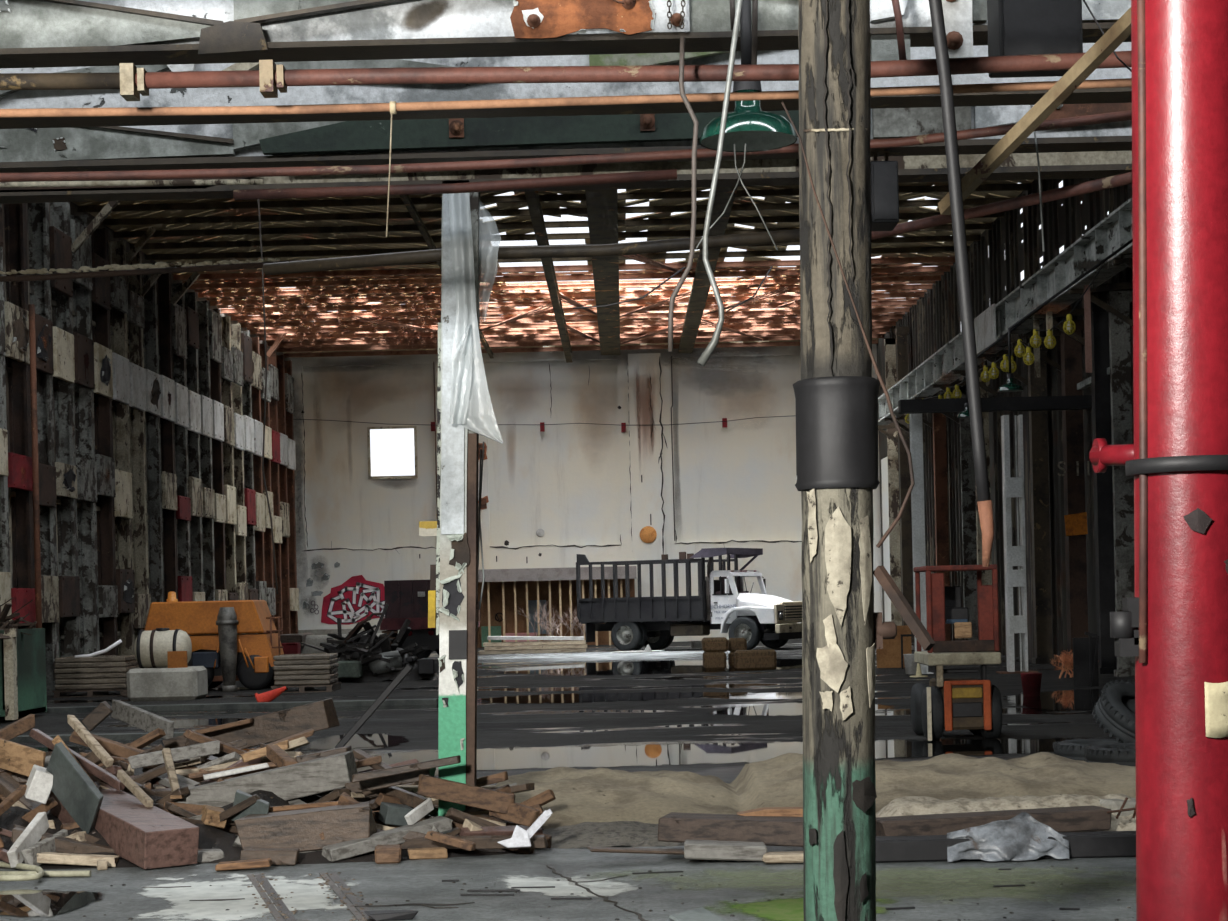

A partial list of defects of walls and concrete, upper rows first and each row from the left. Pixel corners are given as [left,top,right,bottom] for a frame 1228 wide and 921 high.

corrosion [510,0,656,38]
peeling [52,137,67,151]
peeling [12,313,51,362]
peeling [100,355,111,386]
peeling [151,377,161,408]
peeling [62,469,76,492]
peeling [807,489,872,720]
peeling [866,643,876,707]
peeling [852,776,877,813]
peeling [809,828,817,846]
peeling [833,830,869,921]